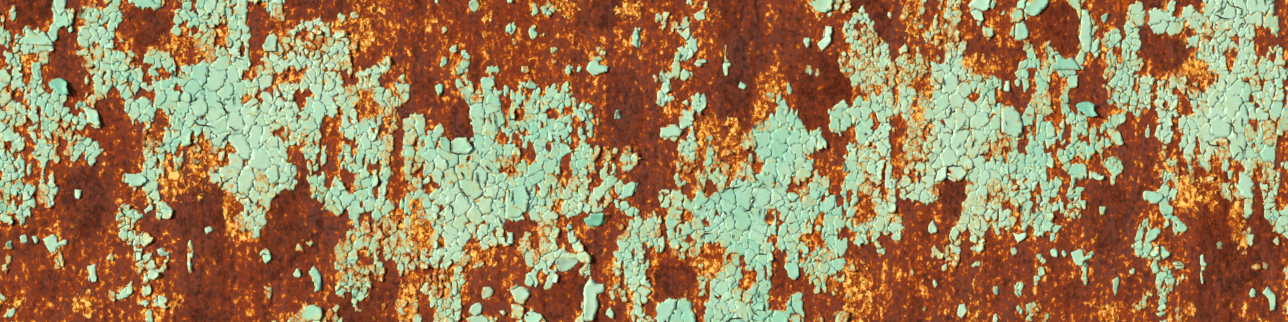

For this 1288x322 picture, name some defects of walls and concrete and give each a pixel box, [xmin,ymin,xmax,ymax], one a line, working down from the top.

crack [1214,0,1265,53]
crack [171,69,238,142]
corrosion [690,84,779,165]
crack [940,98,1008,176]
crack [1186,92,1246,161]
corrosion [156,147,207,201]
corrosion [222,178,247,241]
crack [442,142,530,227]
crack [700,173,765,255]
corrosion [1171,172,1247,255]
corrosion [72,289,97,319]
corrosion [842,259,873,317]